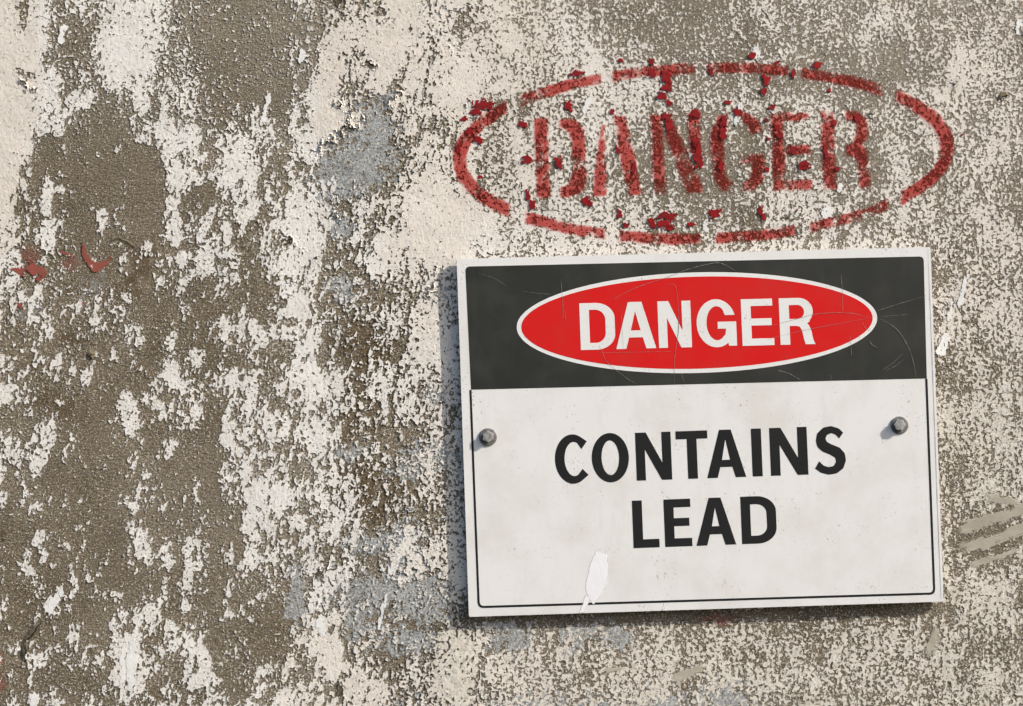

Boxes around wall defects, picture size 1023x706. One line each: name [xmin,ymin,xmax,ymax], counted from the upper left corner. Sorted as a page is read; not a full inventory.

peeling [81,203,126,273]
peeling [156,433,184,461]
peeling [9,487,56,536]
peeling [218,542,234,568]
peeling [224,631,251,667]
peeling [6,684,76,706]